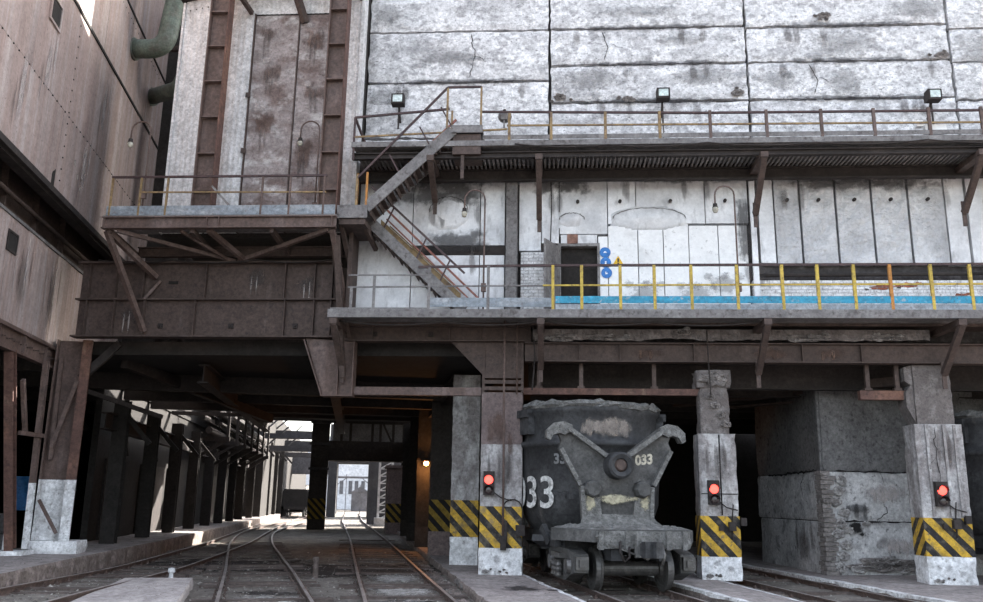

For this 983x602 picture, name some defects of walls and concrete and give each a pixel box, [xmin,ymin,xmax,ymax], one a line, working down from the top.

rust [264,66,280,80]
rust [256,115,273,133]
rust [297,141,310,165]
spalling [696,371,731,427]